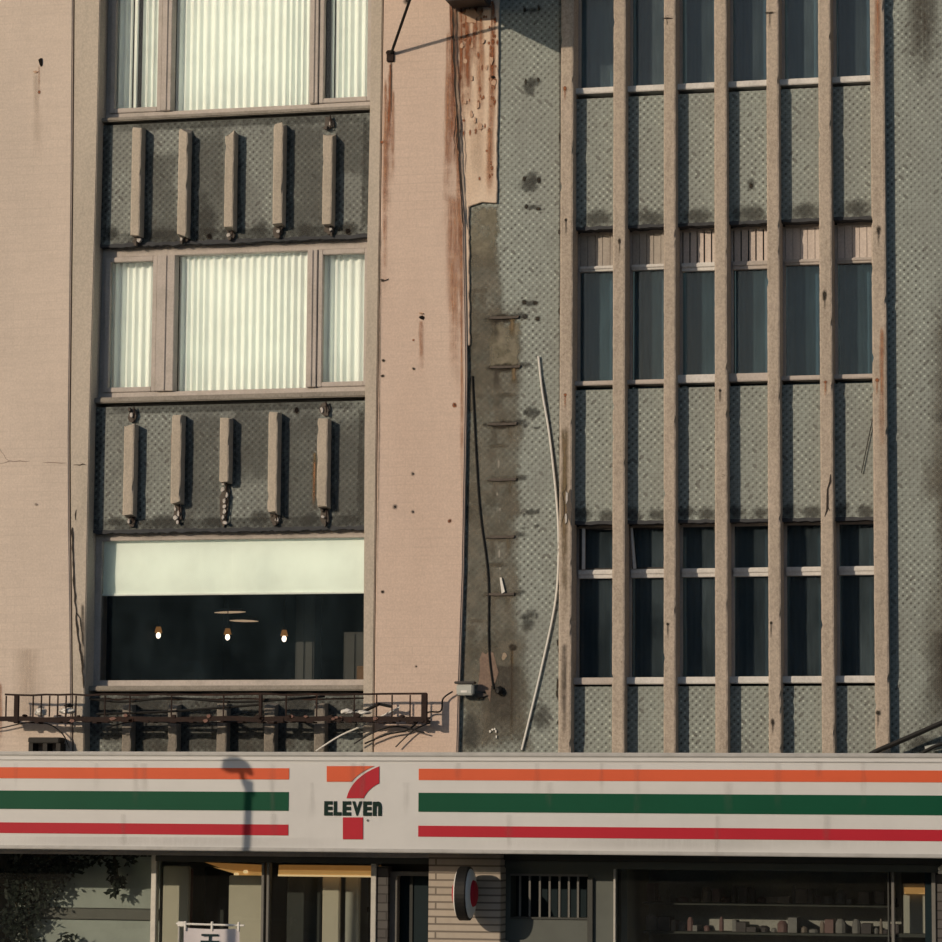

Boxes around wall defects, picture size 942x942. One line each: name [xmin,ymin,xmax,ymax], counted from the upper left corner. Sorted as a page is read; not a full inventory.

corrosion [380,62,394,194]
peeling [459,8,496,136]
corrosion [478,4,498,180]
corrosion [446,7,463,404]
crack [0,450,85,466]
leakage [489,550,505,593]